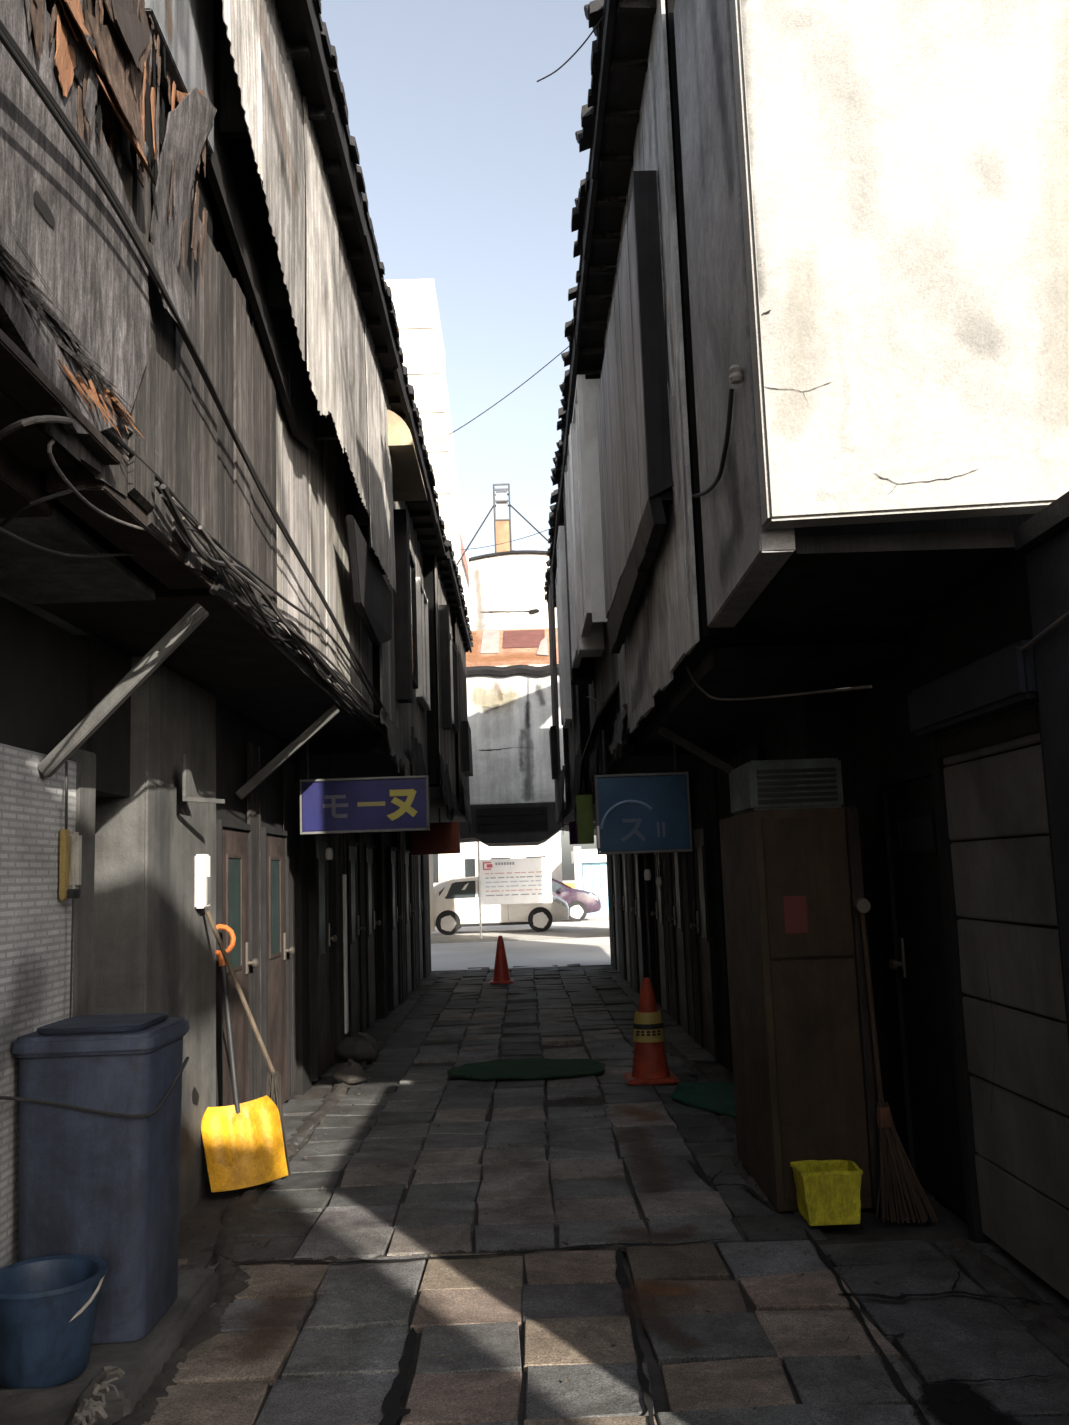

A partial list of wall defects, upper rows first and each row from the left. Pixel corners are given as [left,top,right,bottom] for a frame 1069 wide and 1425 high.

peeling [25,0,208,335]
crack [875,469,978,497]
crack [687,1160,777,1209]
crack [215,1237,733,1425]
crack [804,1229,1056,1425]